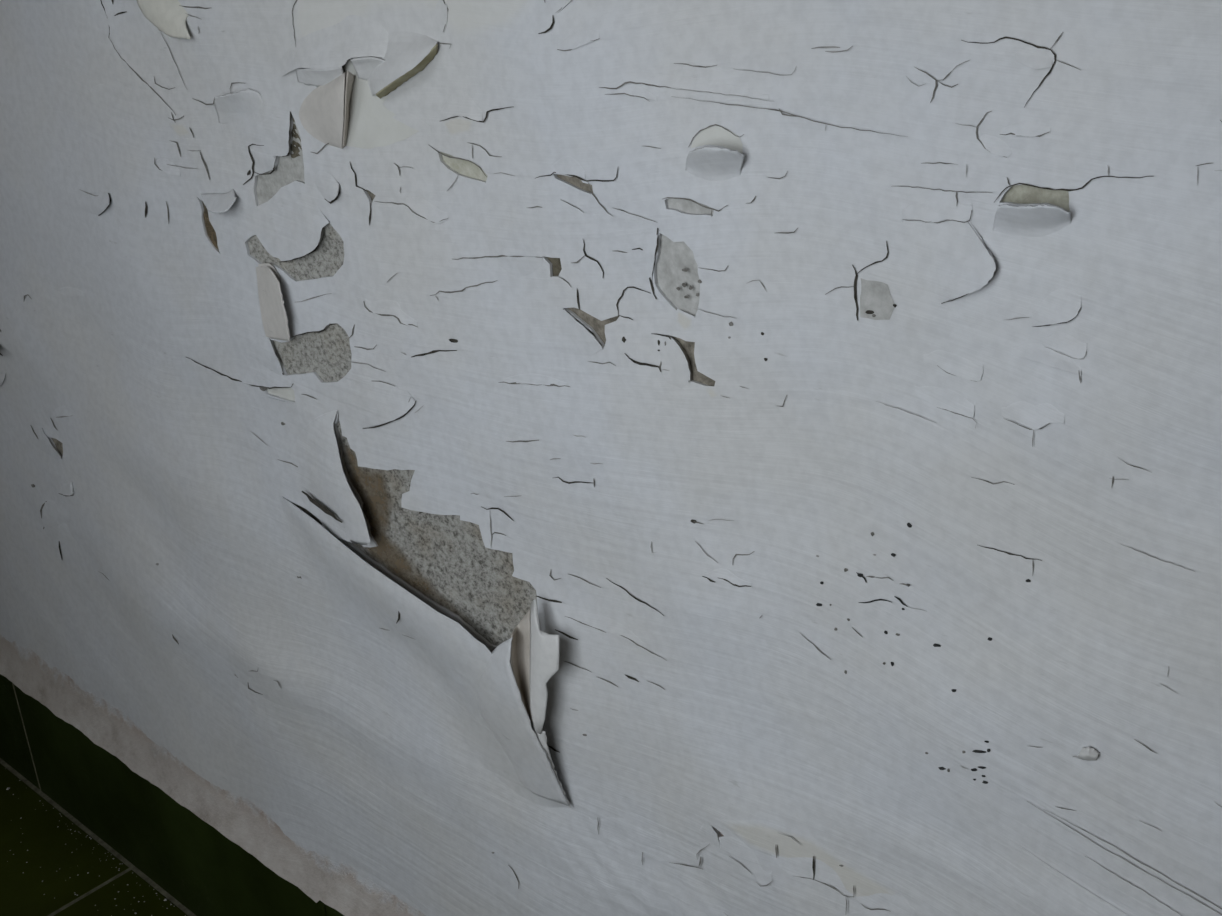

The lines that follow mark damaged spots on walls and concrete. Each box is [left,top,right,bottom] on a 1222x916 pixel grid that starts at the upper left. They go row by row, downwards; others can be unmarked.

peeling [281,15,451,149]
peeling [685,124,745,181]
crack [674,63,796,76]
crack [901,32,1080,206]
spalling [186,171,386,415]
spalling [549,228,721,400]
crack [825,241,897,321]
peeling [927,167,1152,304]
spalling [291,491,342,525]
spalling [336,421,571,808]
damp [0,635,426,916]
crack [589,817,915,916]